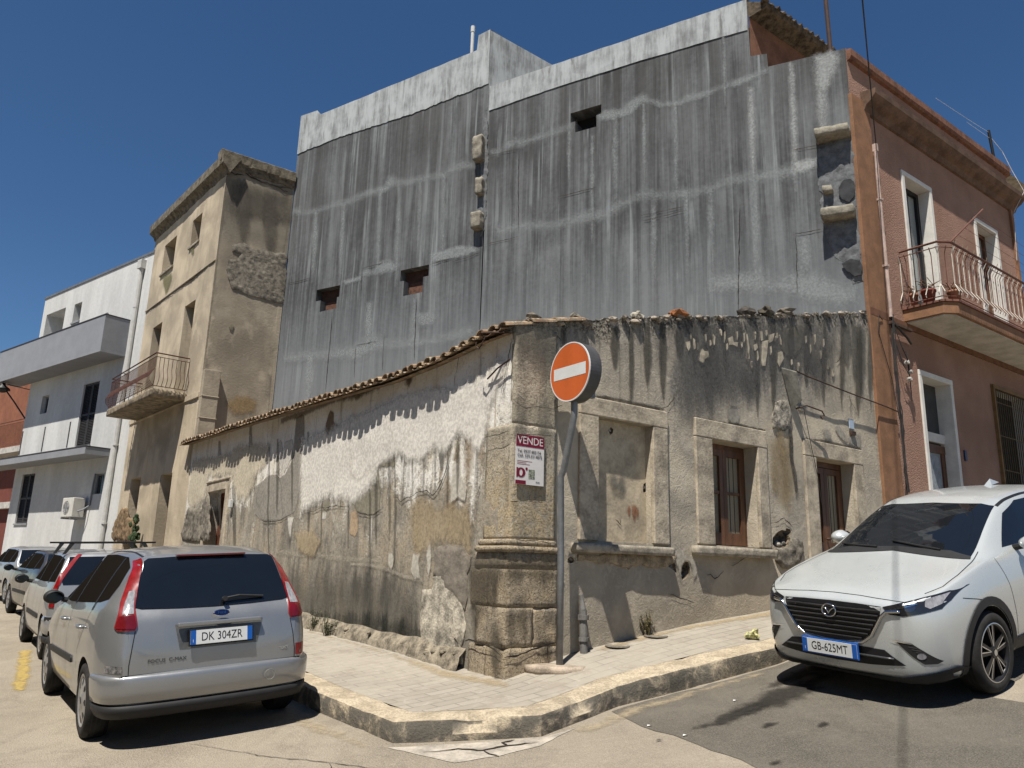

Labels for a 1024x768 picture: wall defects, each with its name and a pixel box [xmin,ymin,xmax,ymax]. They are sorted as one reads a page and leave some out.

water stain [602,97,646,118]
water stain [230,182,289,252]
flaking render [817,140,863,284]
water stain [432,247,475,260]
water stain [595,322,742,410]
water stain [755,352,776,412]
water stain [840,321,873,415]
flaking render [181,494,211,542]
flaking render [349,456,395,538]
water stain [356,541,431,582]
spalling [773,528,791,548]
water stain [344,614,417,636]